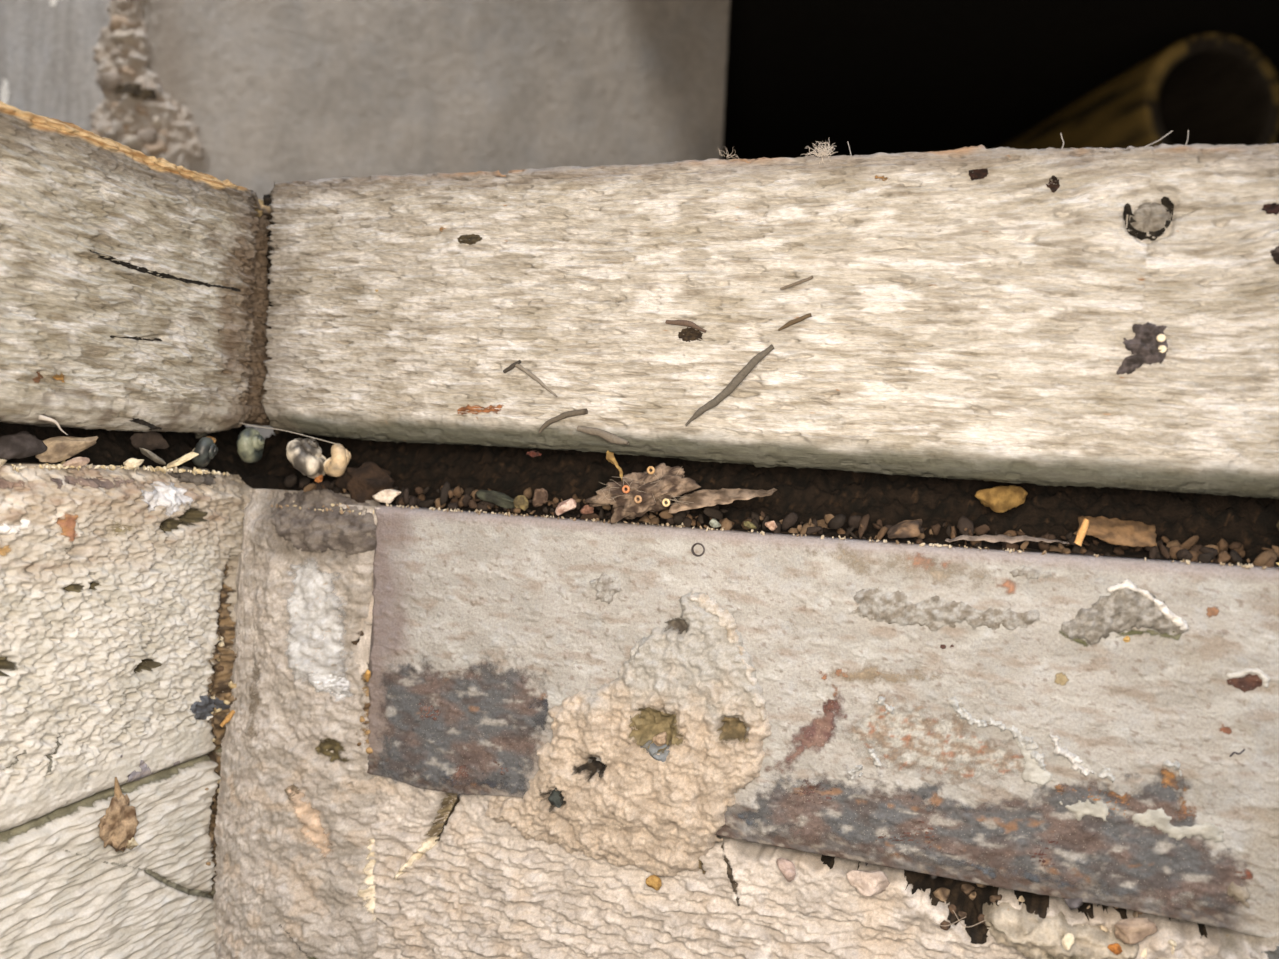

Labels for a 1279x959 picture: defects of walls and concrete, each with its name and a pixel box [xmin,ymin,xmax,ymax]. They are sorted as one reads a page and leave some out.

crack [90,250,240,292]
spalling [665,618,688,634]
rust [378,661,548,798]
spalling [573,757,607,781]
peeling [847,694,1115,785]
rust [738,666,1253,913]